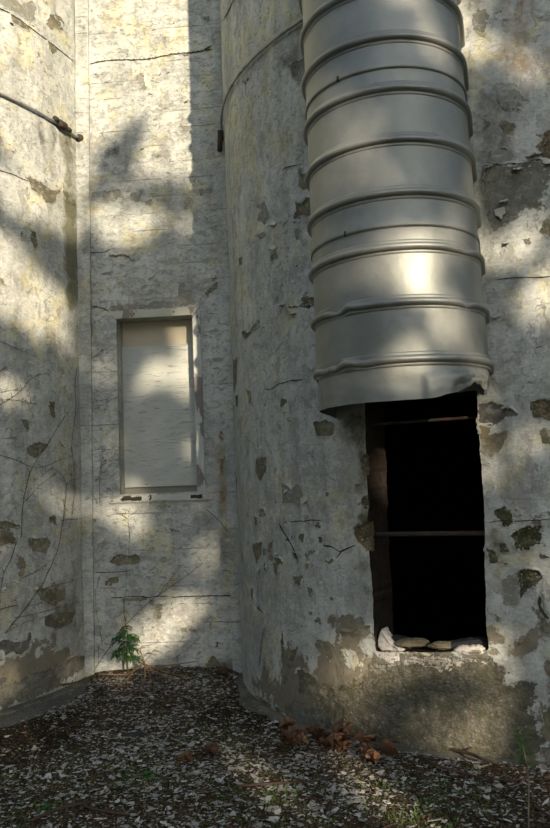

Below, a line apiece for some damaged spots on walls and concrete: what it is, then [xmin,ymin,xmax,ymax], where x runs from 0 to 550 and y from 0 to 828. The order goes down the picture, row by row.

crack [0,7,211,64]
peeling [479,130,550,235]
peeling [540,219,550,240]
peeling [98,275,218,311]
peeling [313,418,336,438]
peeling [476,401,519,459]
spalling [530,399,550,444]
peeling [27,432,81,480]
peeling [255,455,266,481]
spalling [353,520,375,551]
spalling [483,504,550,606]
spalling [0,623,550,828]